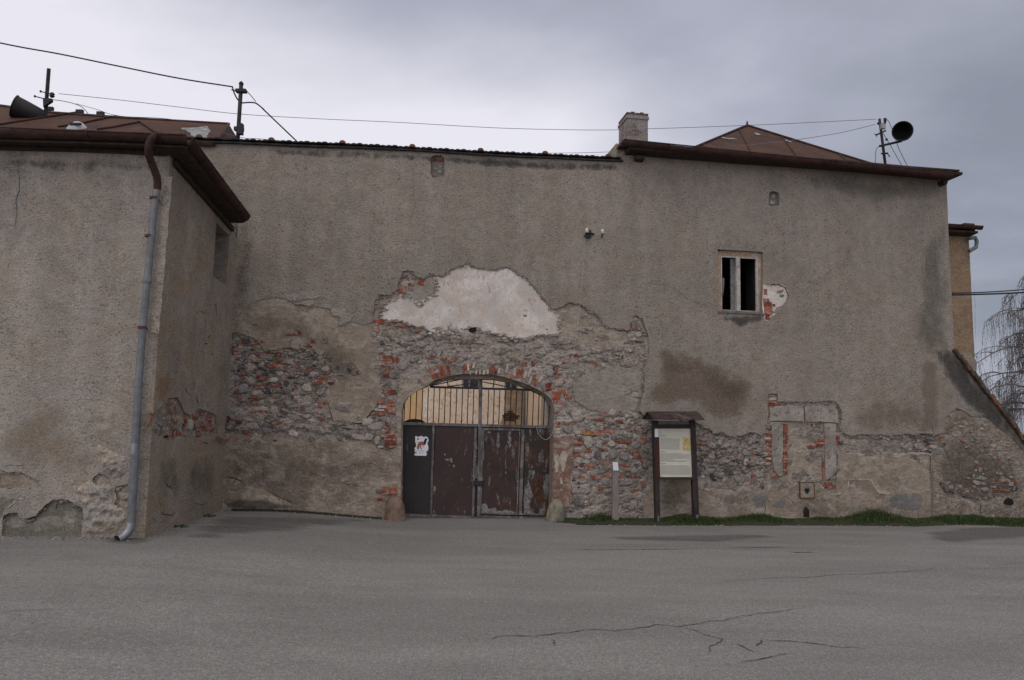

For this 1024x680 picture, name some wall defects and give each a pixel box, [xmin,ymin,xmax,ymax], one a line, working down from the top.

flaking render [143,261,1024,518]
flaking render [0,470,83,537]
flaking render [94,474,129,508]